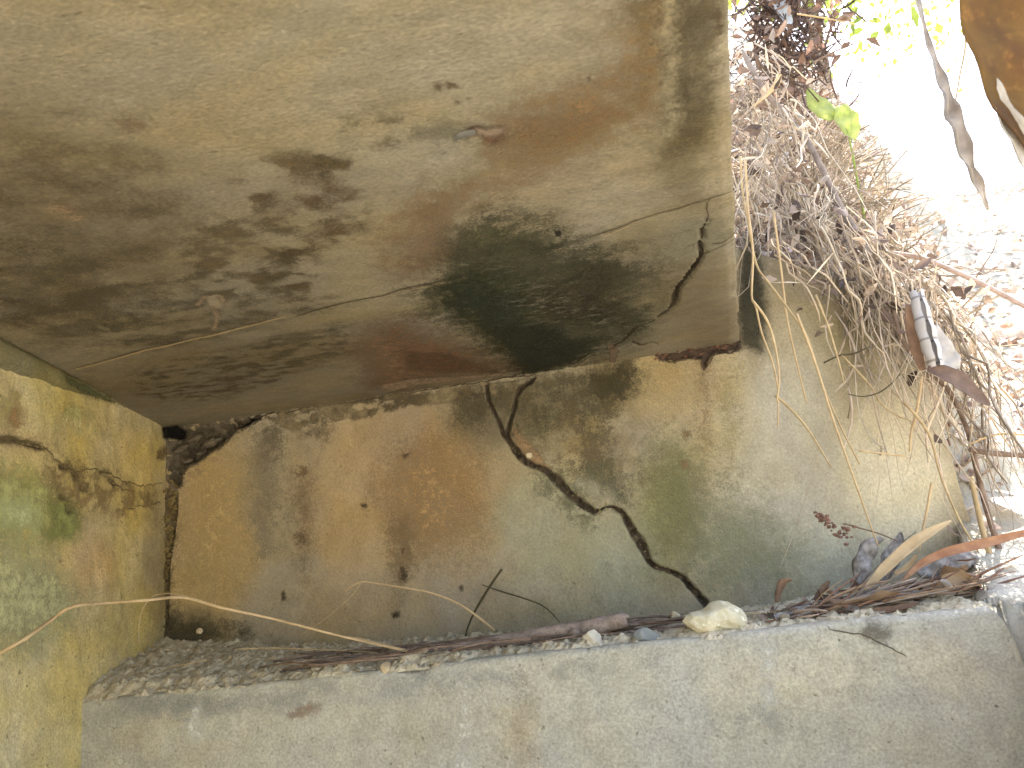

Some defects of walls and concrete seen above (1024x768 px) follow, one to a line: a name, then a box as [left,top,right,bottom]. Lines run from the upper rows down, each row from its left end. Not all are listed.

water stain [274,153,363,242]
crack [296,274,468,317]
crack [568,190,736,367]
crack [0,436,161,509]
crack [254,373,709,607]
water stain [569,420,624,501]